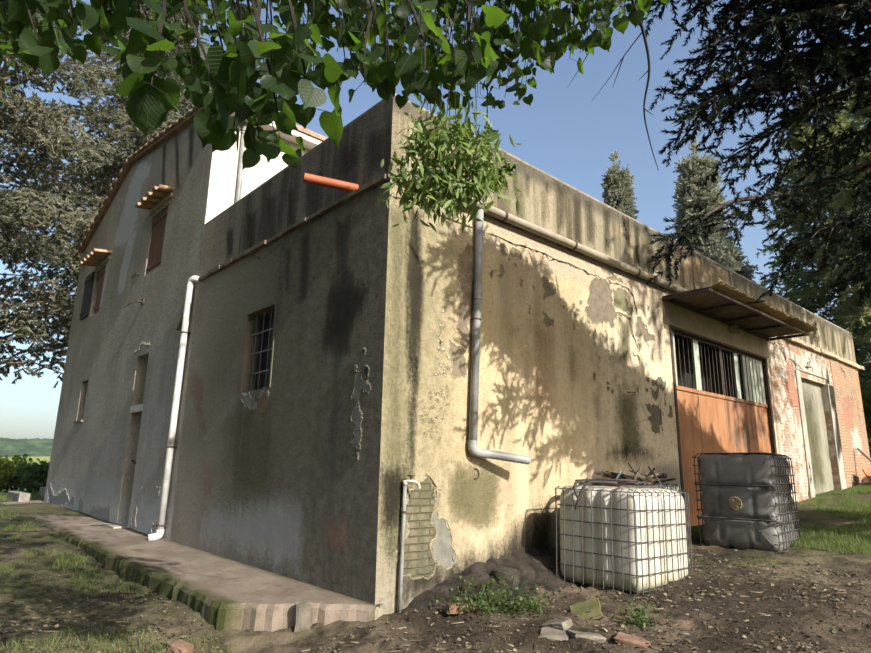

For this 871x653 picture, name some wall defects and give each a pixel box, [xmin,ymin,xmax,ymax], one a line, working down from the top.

leakage [395,210,424,467]
peeling [488,242,522,280]
crack [391,191,664,360]
leakage [575,201,592,241]
peeling [519,273,656,362]
leakage [625,228,652,268]
peeling [351,347,372,461]
peeling [592,371,674,436]
peeling [777,349,800,418]
leakage [383,445,403,547]
peeling [396,476,457,580]